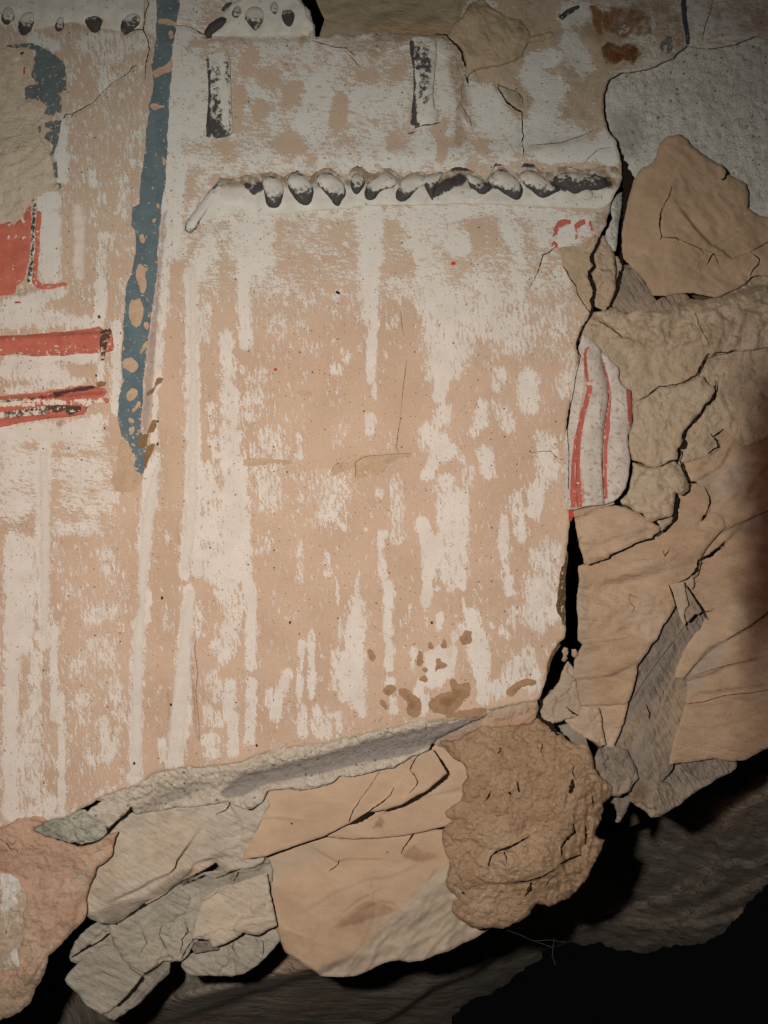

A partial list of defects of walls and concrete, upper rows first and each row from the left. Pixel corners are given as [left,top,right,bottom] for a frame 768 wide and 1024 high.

crack [63,1,150,119]
spalling [301,0,324,37]
peeling [0,48,59,223]
peeling [558,180,624,312]
spalling [543,506,588,690]
peeling [670,578,702,625]
spalling [586,738,599,759]
crack [264,750,450,859]
spalling [595,801,648,836]
spalling [64,915,96,941]